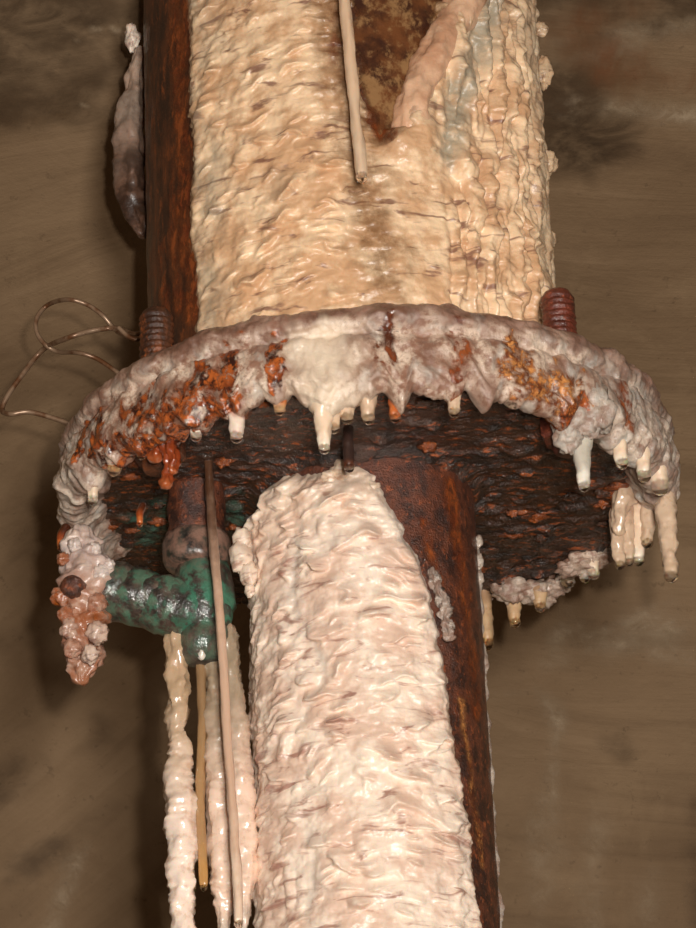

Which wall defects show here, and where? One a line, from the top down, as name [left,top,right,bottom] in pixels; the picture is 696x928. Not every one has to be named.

corrosion [158,0,198,324]
water stain [186,0,625,333]
corrosion [70,331,251,470]
corrosion [264,331,288,396]
corrosion [375,309,397,365]
corrosion [448,331,472,401]
corrosion [497,329,594,431]
corrosion [616,381,634,432]
water stain [50,303,681,928]
corrosion [445,477,477,679]